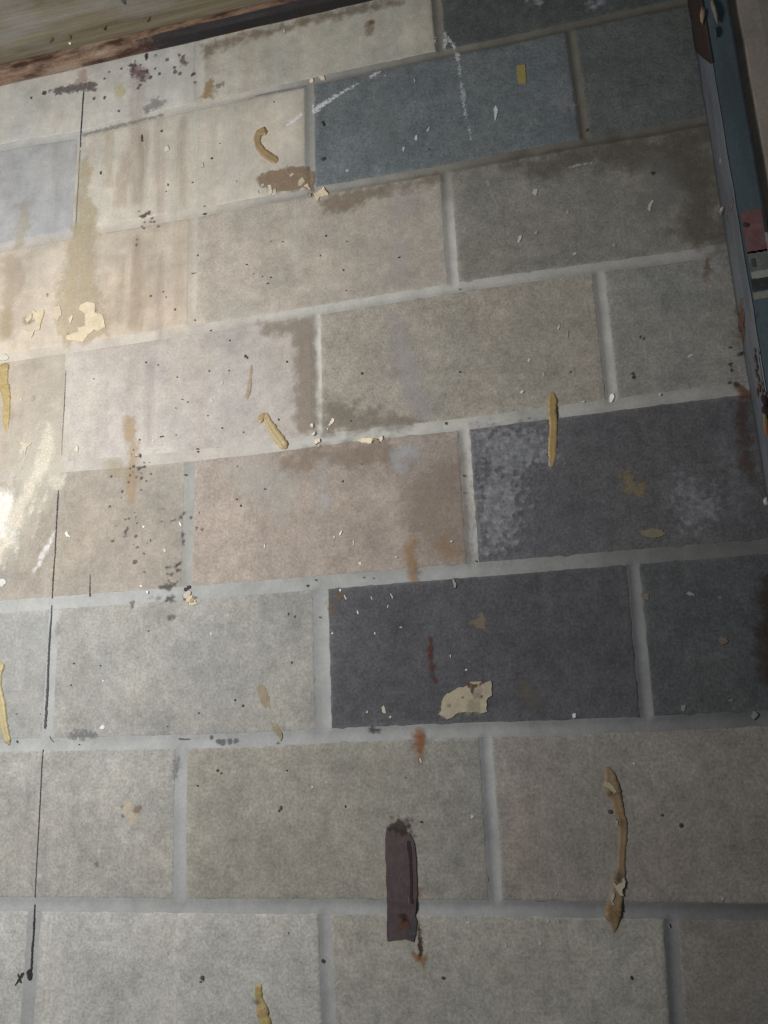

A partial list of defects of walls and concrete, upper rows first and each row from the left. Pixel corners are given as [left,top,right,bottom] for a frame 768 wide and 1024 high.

crack [75,91,84,229]
peeling [255,166,329,201]
peeling [23,302,106,342]
leakage [0,490,19,552]
leakage [34,534,54,571]
spalling [439,669,492,719]
crack [26,490,59,980]
peeling [611,878,626,905]